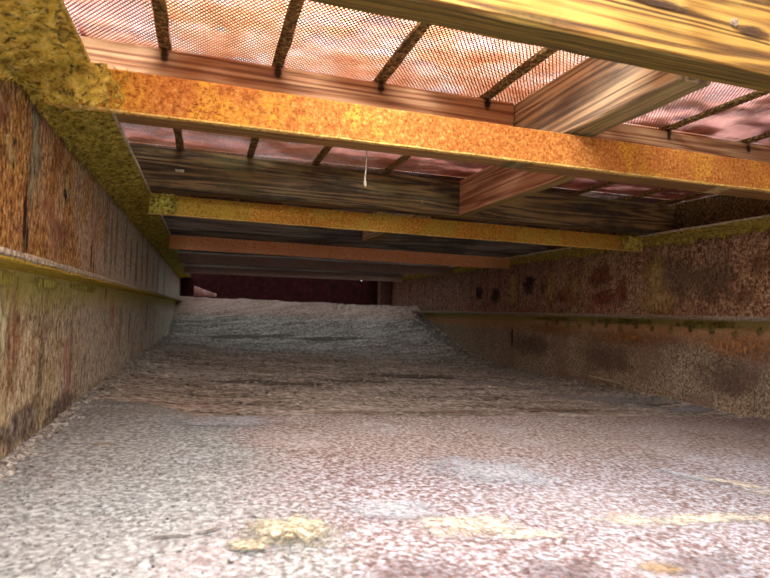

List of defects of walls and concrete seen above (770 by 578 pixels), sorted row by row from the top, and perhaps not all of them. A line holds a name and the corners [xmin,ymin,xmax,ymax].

water stain [23,103,42,253]
corrosion [47,103,770,202]
corrosion [149,213,641,252]
corrosion [7,310,19,386]
water stain [0,393,73,452]